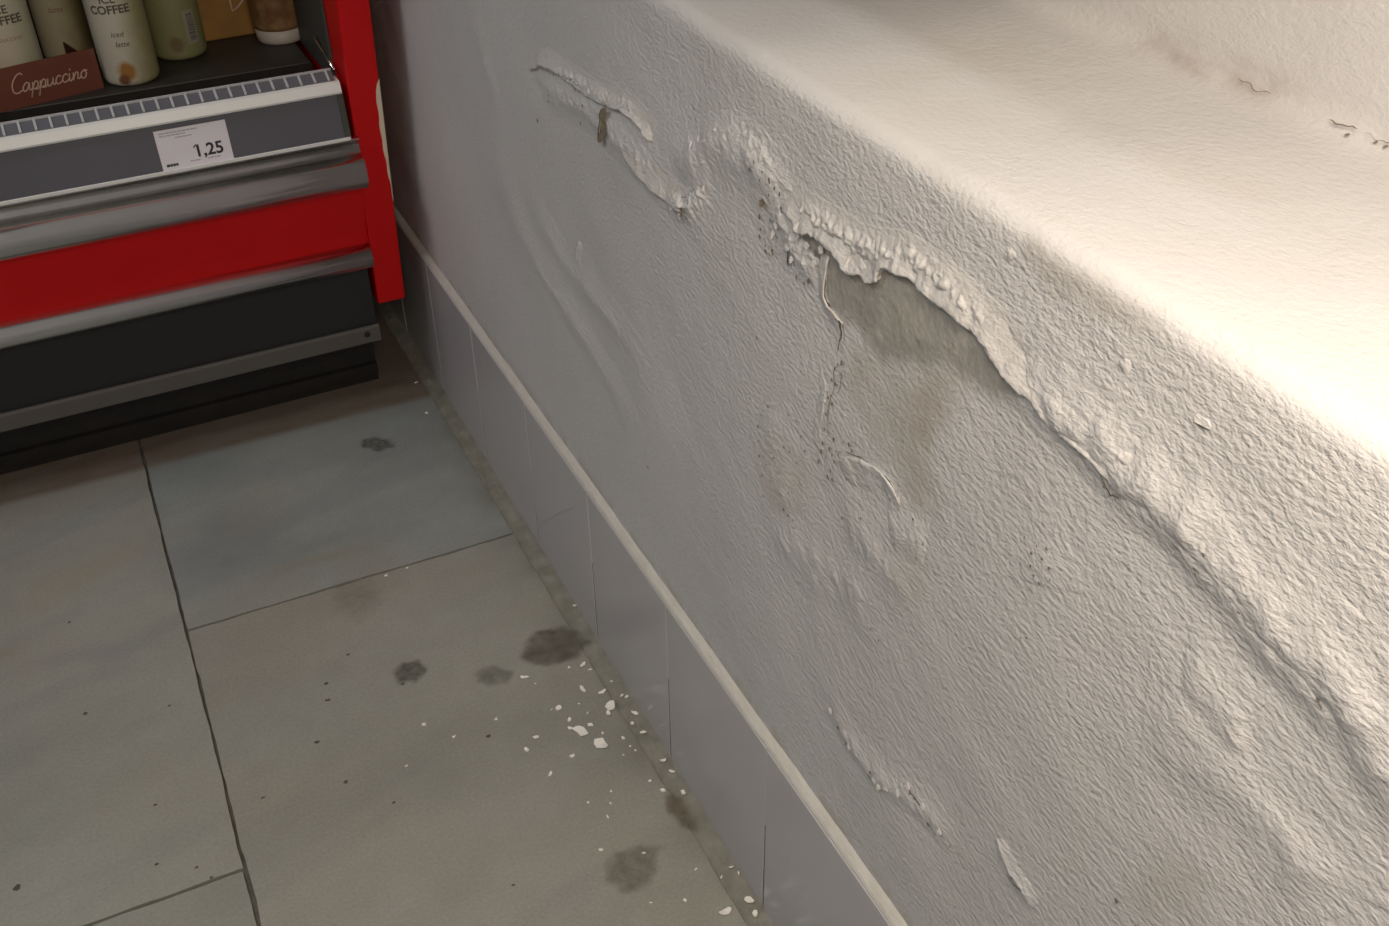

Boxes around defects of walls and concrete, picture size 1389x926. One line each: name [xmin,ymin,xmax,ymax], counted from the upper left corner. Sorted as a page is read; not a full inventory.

crack [1329,119,1389,148]
crack [814,280,852,482]
flaking render [758,183,1050,428]